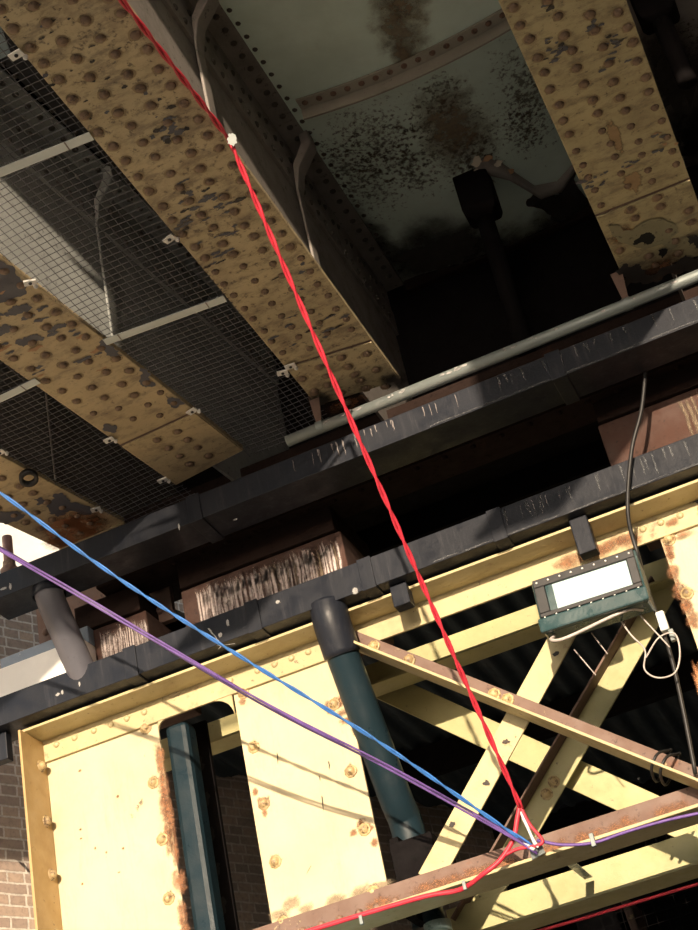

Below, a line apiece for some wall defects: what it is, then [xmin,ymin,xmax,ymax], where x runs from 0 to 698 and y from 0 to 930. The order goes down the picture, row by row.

peeling [149,98,190,144]
water stain [404,75,507,182]
peeling [167,179,247,238]
peeling [616,232,698,287]
peeling [0,260,82,355]
peeling [0,511,25,525]
peeling [34,493,92,517]
corrosion [43,514,106,548]
corrosion [664,518,698,628]
corrosion [153,746,185,892]
corrosion [576,818,635,843]
corrosion [178,904,189,930]